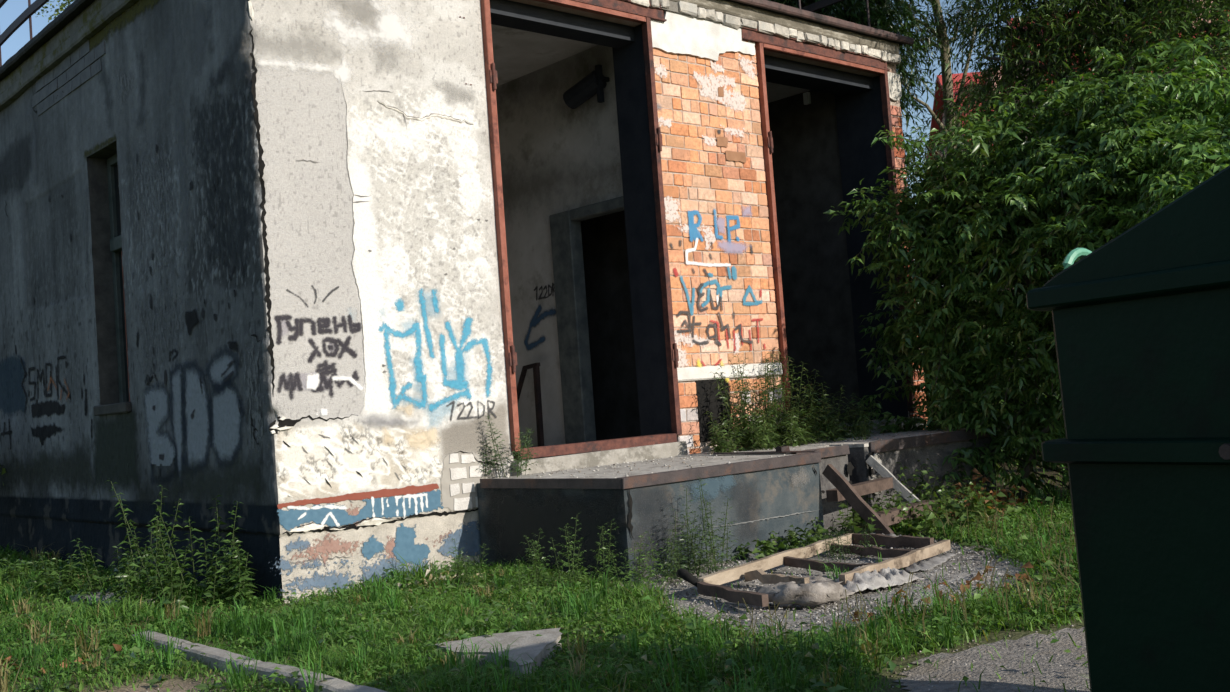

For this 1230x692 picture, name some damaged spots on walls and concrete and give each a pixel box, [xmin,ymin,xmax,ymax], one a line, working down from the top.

spalling [717,137,746,163]
peeling [238,343,482,598]